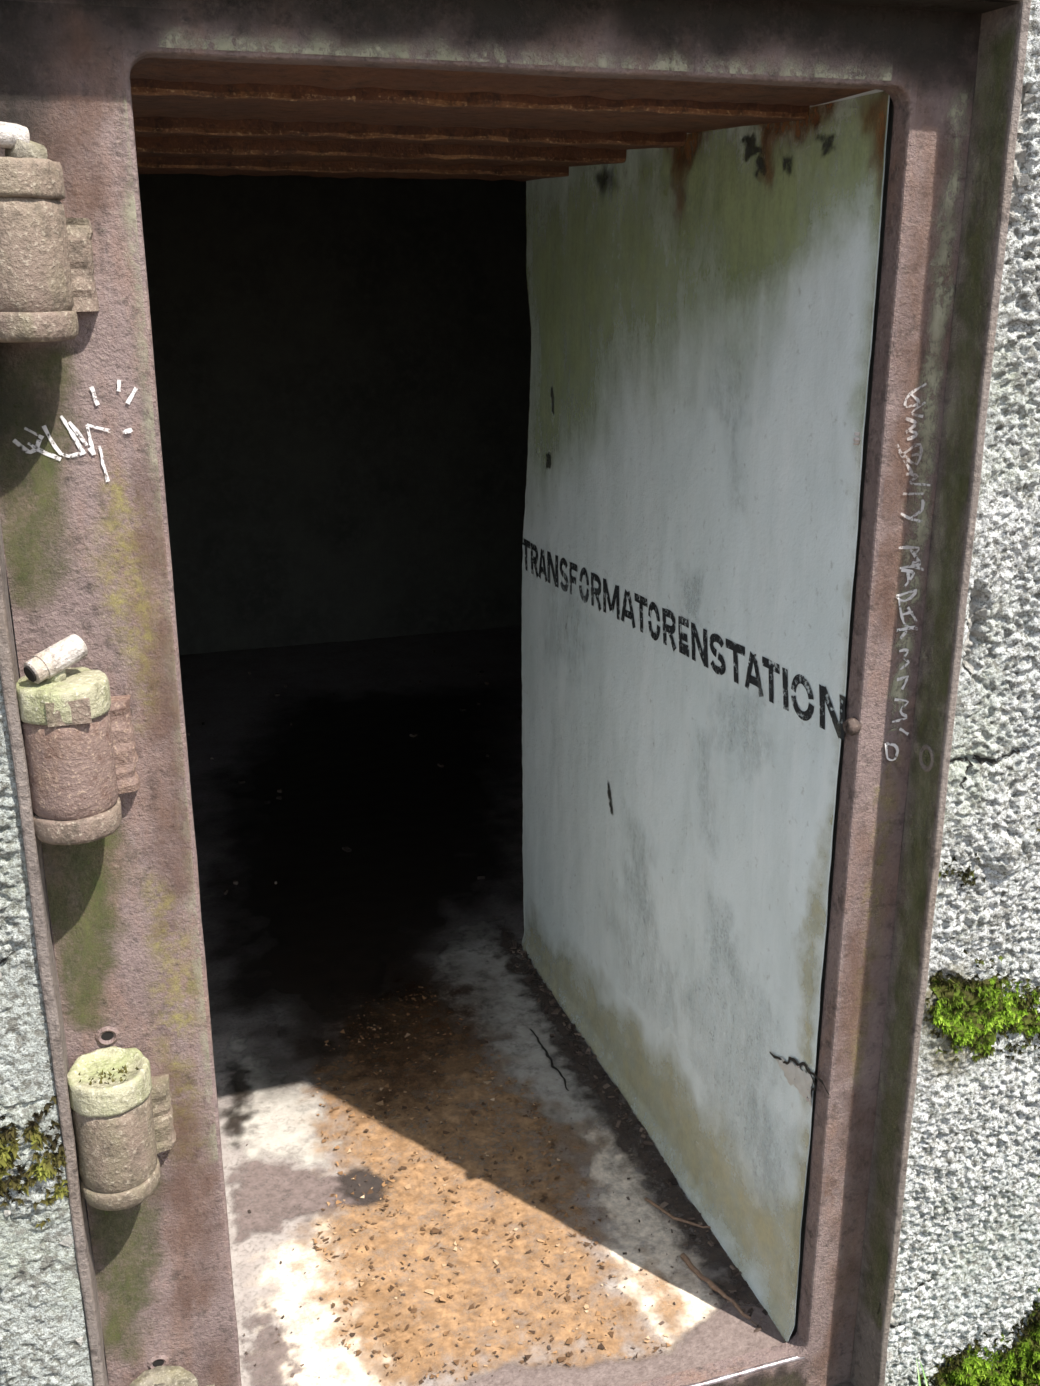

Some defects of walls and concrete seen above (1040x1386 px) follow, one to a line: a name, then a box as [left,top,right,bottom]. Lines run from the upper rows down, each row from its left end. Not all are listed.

corrosion [761,102,834,182]
crack [950,749,1020,789]
damp [803,894,826,1005]
damp [207,690,806,1386]
spalling [776,1057,813,1106]